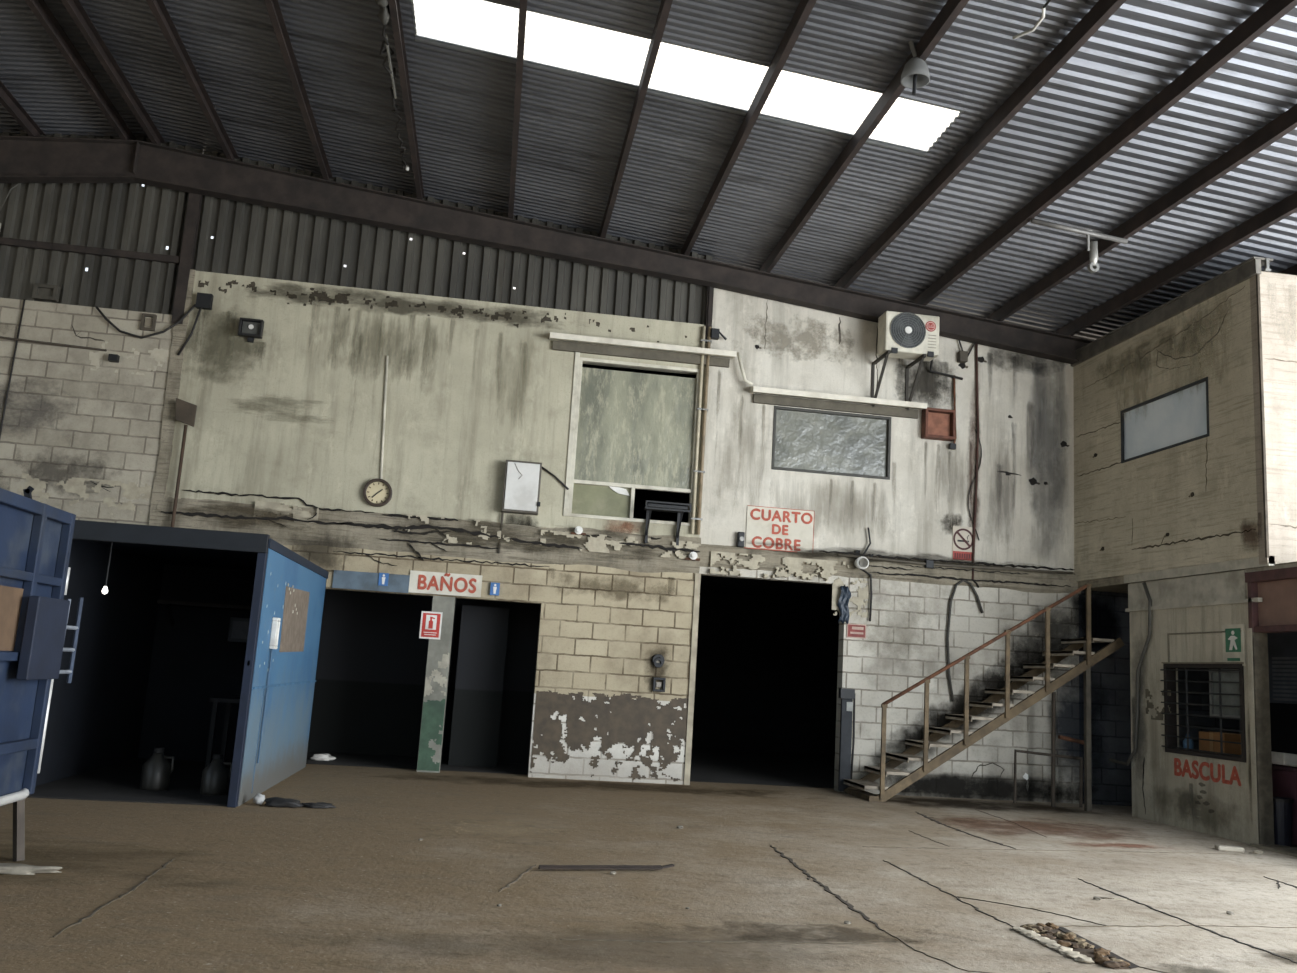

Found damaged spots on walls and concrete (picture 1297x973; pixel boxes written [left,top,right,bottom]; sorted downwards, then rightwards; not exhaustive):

damp [198,280,566,328]
damp [991,350,1047,373]
peeling [254,501,319,524]
peeling [402,514,510,545]
peeling [417,653,450,771]
peeling [530,690,688,782]
crack [560,845,990,973]
crack [862,809,1297,963]